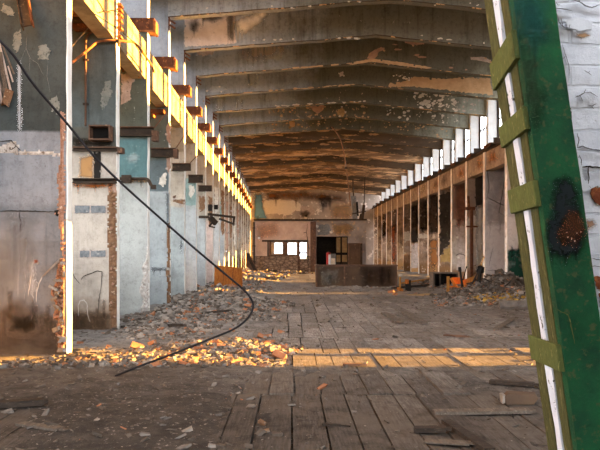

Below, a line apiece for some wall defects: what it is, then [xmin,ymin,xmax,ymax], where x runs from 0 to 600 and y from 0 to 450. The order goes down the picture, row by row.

crack [556,0,598,30]
peeling [12,29,22,53]
peeling [37,44,51,60]
peeling [100,73,135,110]
peeling [331,35,493,137]
crack [577,134,600,188]
flaking render [590,186,600,206]
spalling [0,95,67,352]
corrosion [560,212,595,243]
spalling [107,183,117,329]
leakage [0,304,57,352]